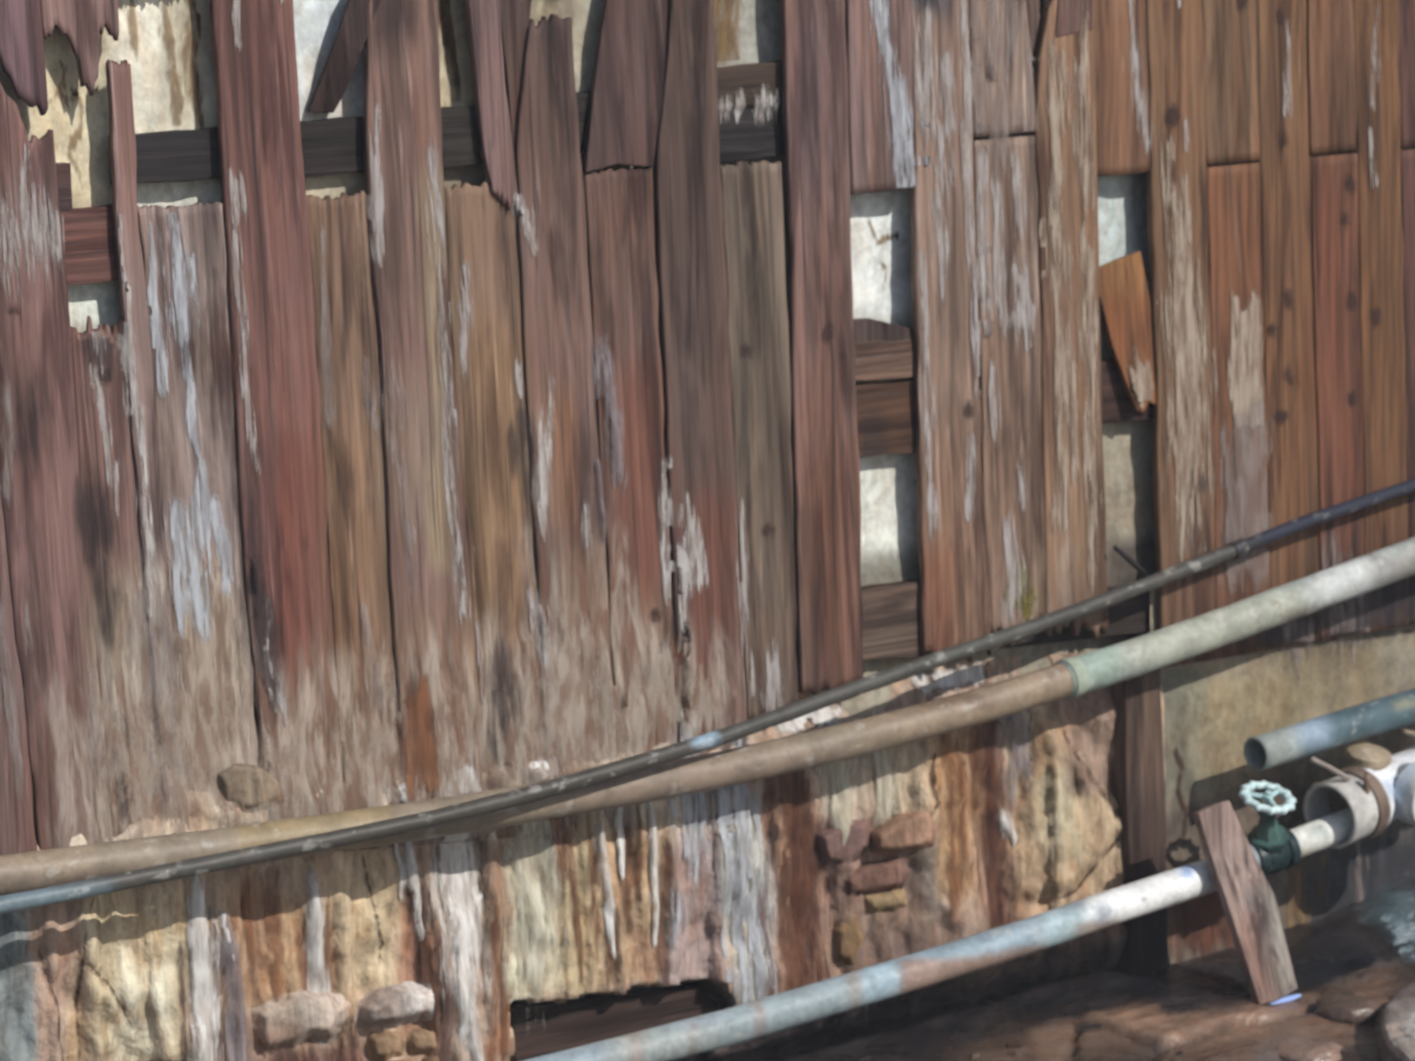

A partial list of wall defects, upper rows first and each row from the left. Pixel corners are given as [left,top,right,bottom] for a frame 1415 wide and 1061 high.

crack [39,900,131,1061]
water stain [187,875,250,1061]
water stain [394,832,487,1061]
water stain [648,783,777,1004]